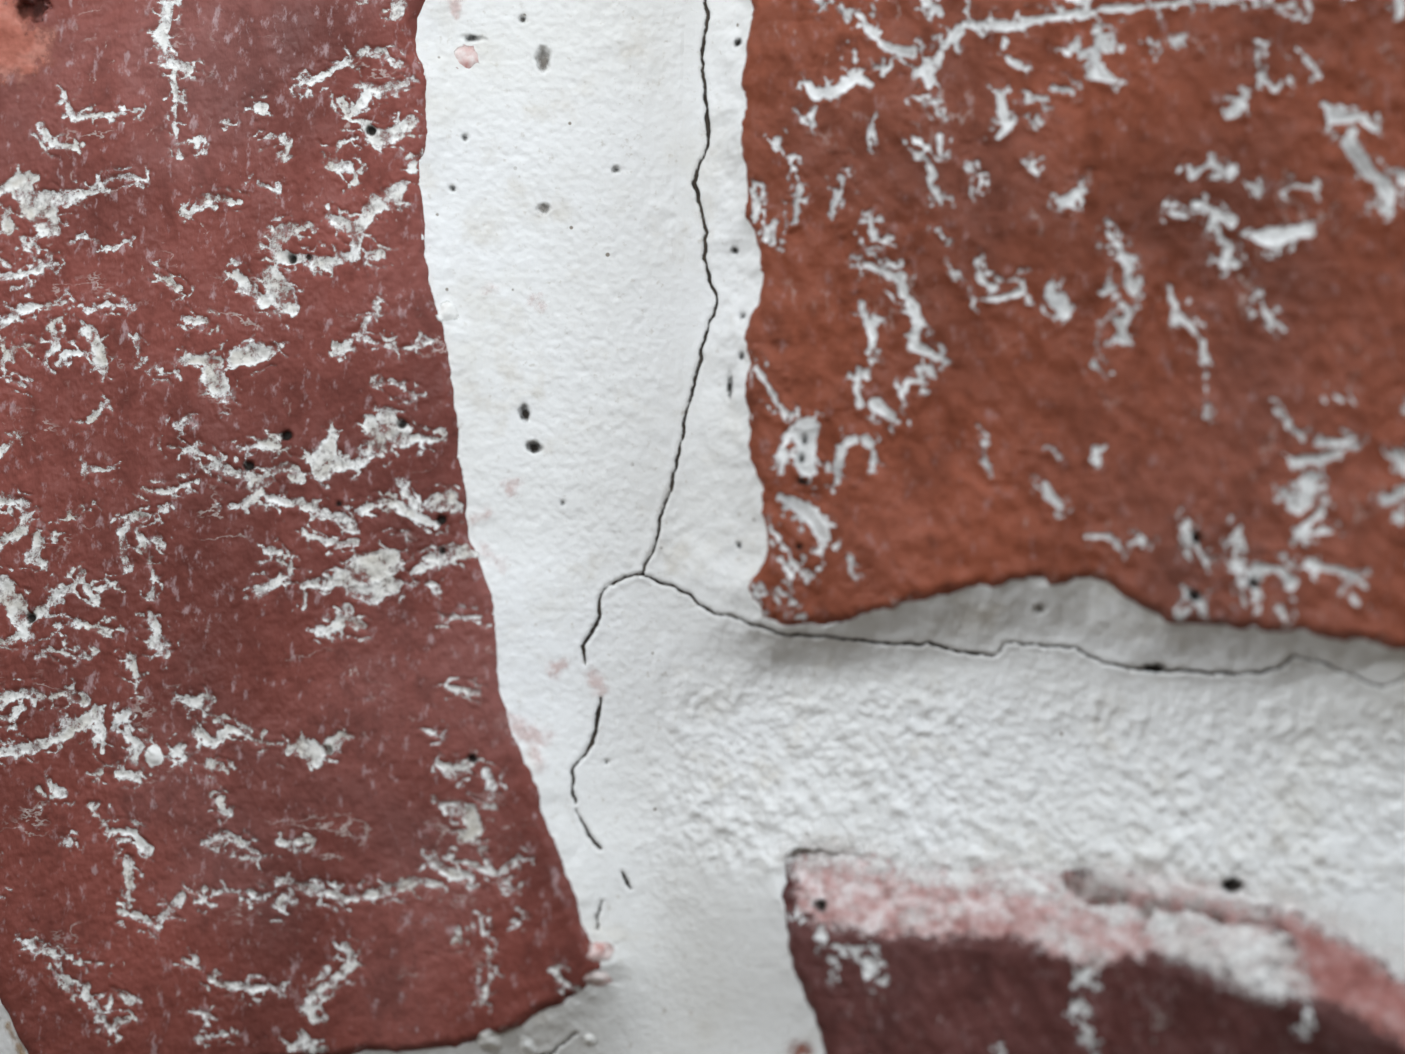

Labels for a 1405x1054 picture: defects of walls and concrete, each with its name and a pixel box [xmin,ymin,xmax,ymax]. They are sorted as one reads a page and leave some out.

crack [581,0,1405,688]
crack [570,697,631,929]